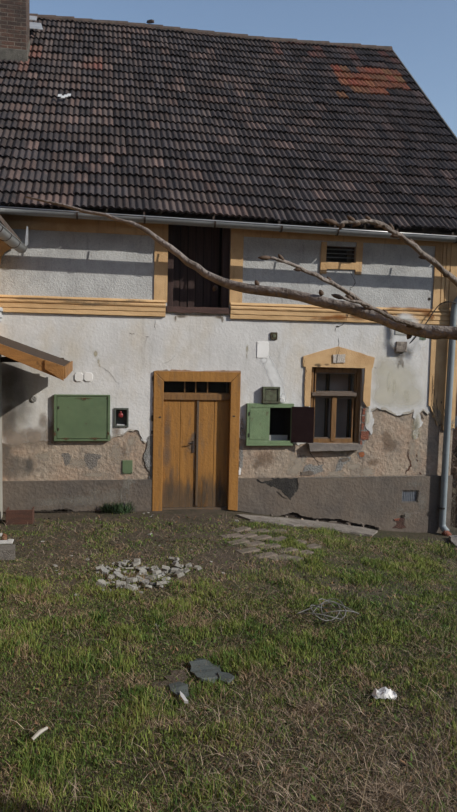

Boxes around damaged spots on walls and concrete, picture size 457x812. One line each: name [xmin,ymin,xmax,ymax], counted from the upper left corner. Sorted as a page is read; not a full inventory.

peeling [2,369,241,481]
peeling [238,405,457,482]